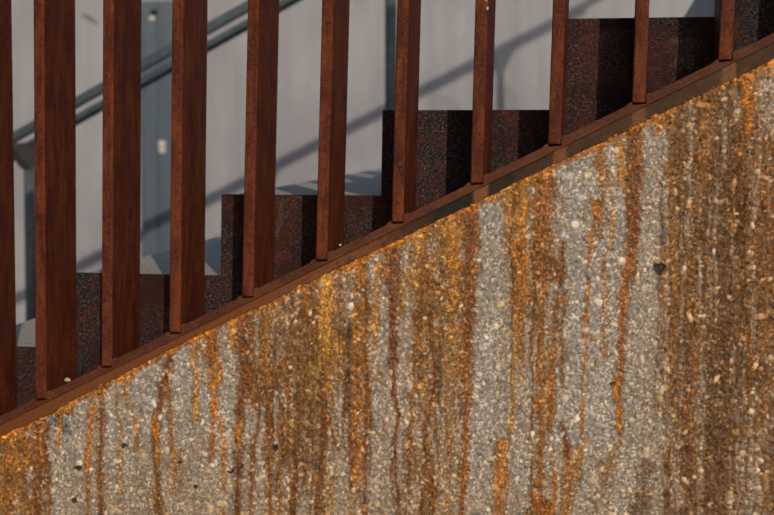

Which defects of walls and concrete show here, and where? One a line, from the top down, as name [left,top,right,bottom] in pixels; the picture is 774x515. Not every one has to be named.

rust [718,59,774,154]
rust [683,254,712,388]
rust [693,85,774,515]